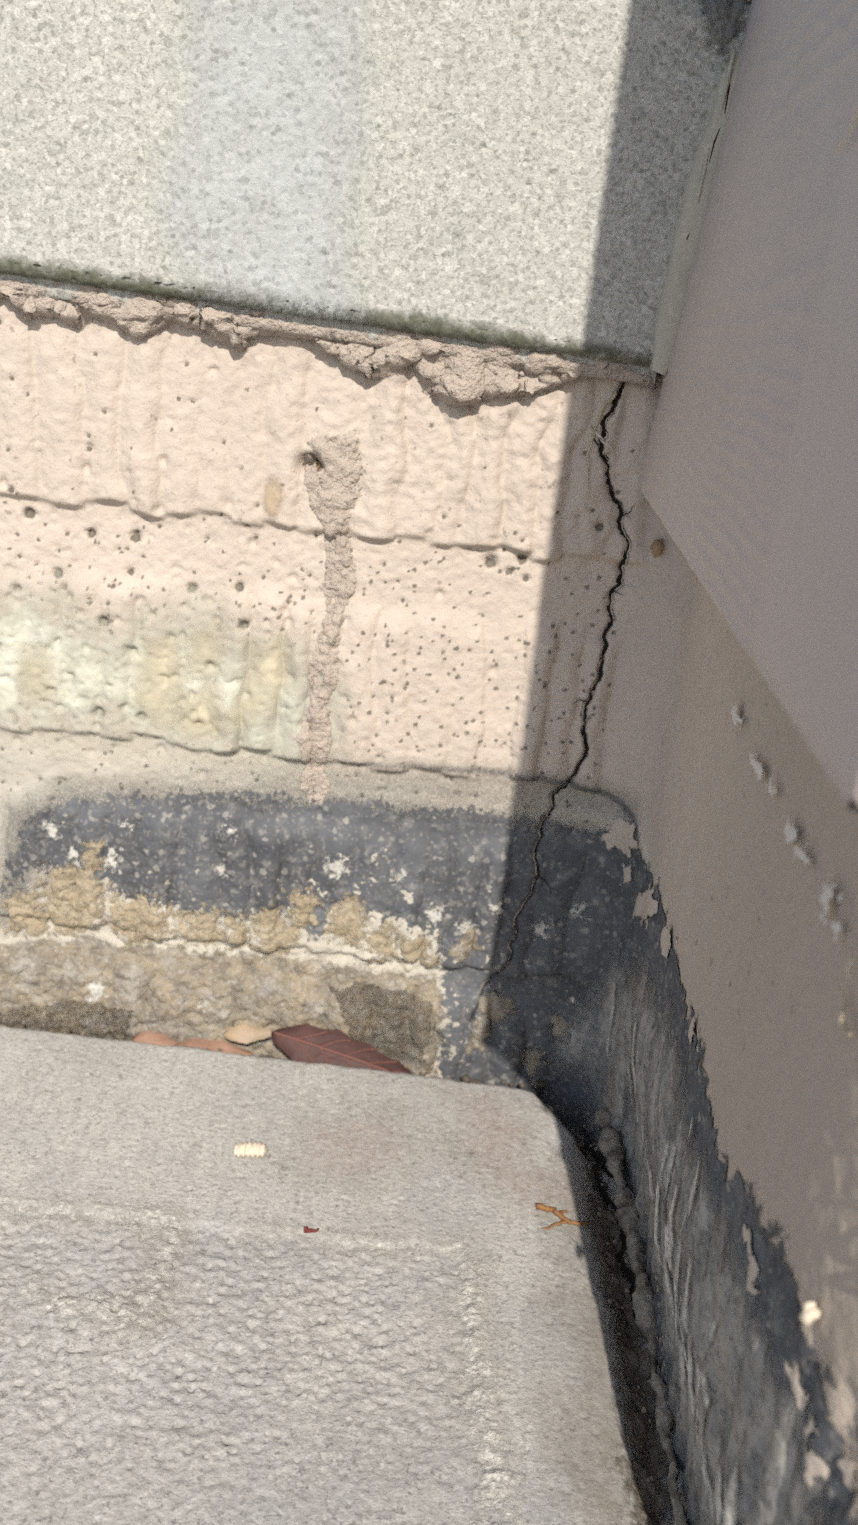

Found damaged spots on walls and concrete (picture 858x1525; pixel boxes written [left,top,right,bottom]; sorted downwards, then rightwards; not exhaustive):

crack [471,382,635,1019]
spalling [0,936,446,1076]
spalling [448,927,490,961]
spalling [464,991,518,1055]
spalling [522,1045,549,1084]
peeling [601,817,671,963]
peeling [742,1224,759,1297]
peeling [784,1360,856,1491]